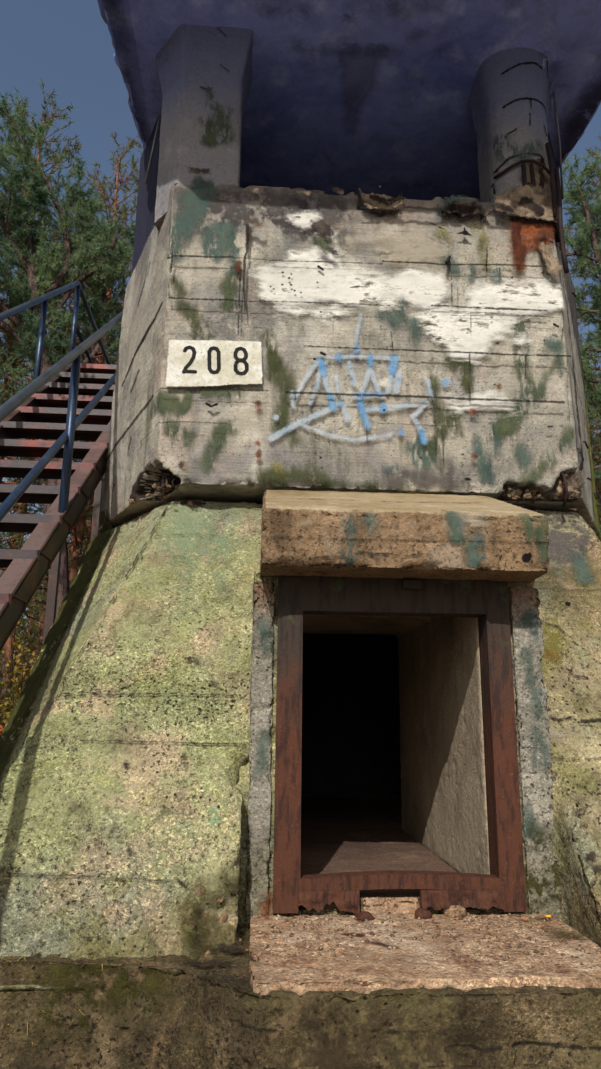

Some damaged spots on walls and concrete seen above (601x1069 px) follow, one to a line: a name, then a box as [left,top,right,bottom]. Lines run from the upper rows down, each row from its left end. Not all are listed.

crack [106,57,588,491]
peeling [253,142,569,362]
corrosion [510,216,554,271]
spalling [128,461,208,507]
spalling [498,468,585,510]